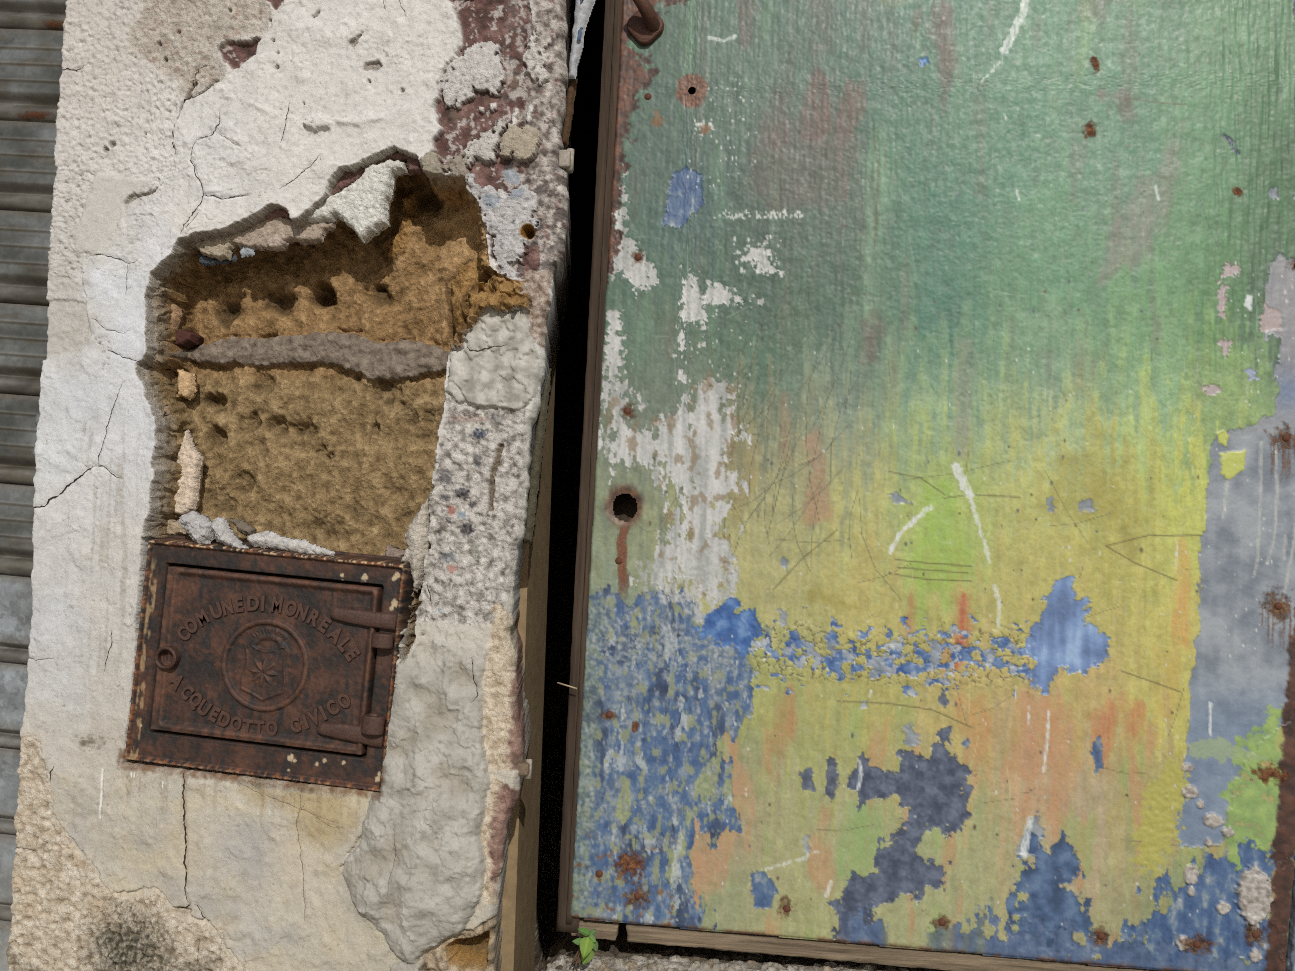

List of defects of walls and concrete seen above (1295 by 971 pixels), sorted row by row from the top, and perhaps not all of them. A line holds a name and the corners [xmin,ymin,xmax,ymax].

crack [172,65,244,231]
crack [33,319,139,509]
spalling [125,0,583,971]
corrosion [617,526,629,593]
peeling [571,164,1112,947]
peeling [932,252,1295,971]
spalling [7,735,249,971]
leakage [106,931,186,971]
crack [180,769,209,965]
corrosion [181,767,244,780]